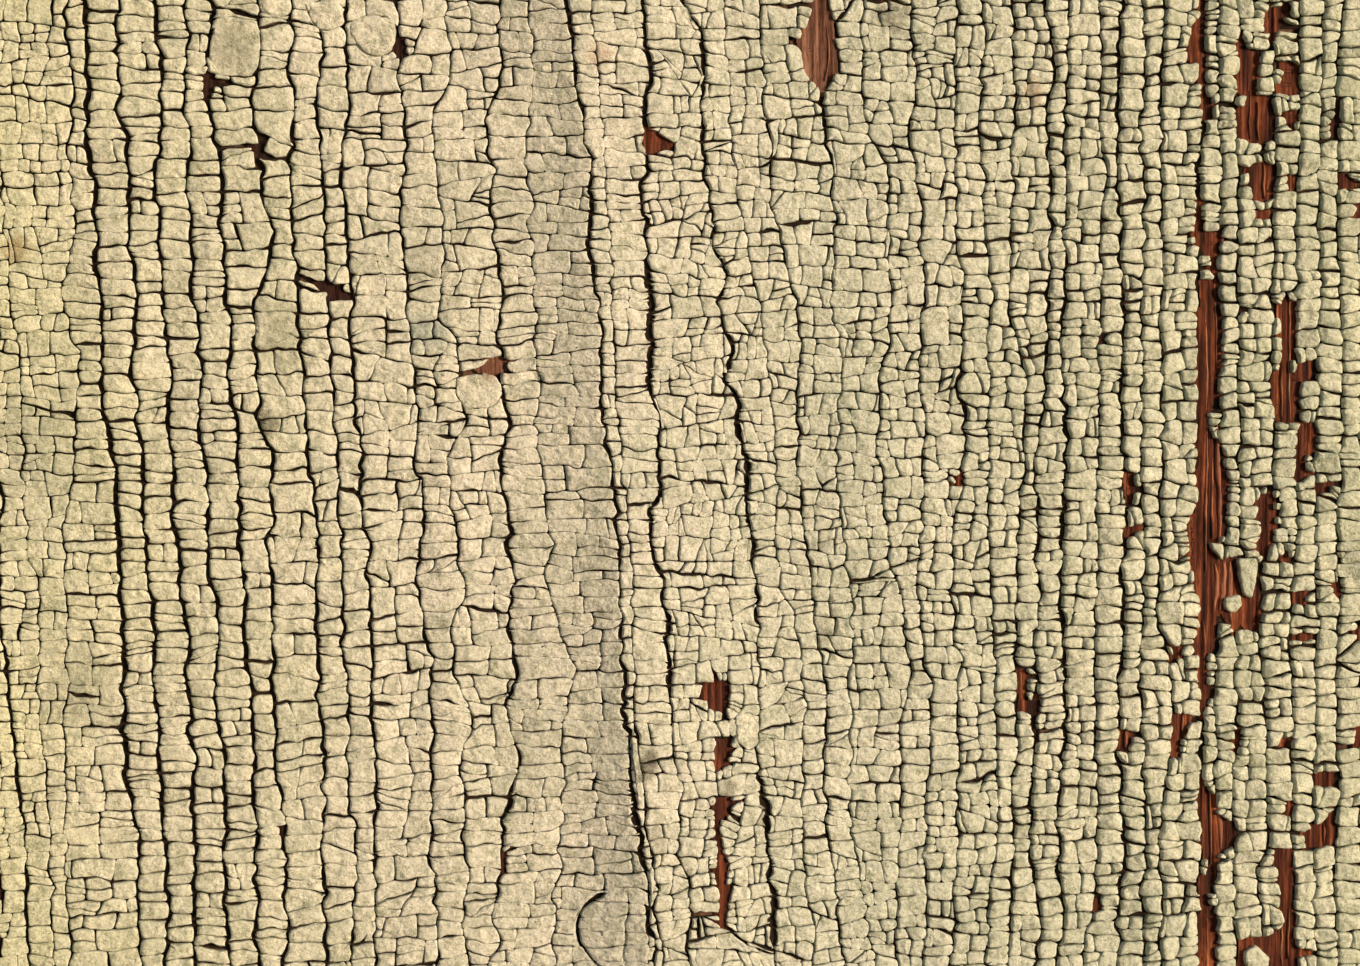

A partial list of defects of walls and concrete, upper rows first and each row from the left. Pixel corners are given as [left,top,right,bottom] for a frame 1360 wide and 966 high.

crack [722,0,807,49]
peeling [784,0,863,106]
crack [831,0,895,39]
crack [1207,0,1237,45]
peeling [298,263,387,318]
peeling [456,341,540,408]
peeling [1094,0,1360,966]
crack [1191,321,1360,940]
peeling [993,668,1065,754]
peeling [689,795,762,953]
crack [1210,848,1242,966]
crack [1294,878,1360,966]